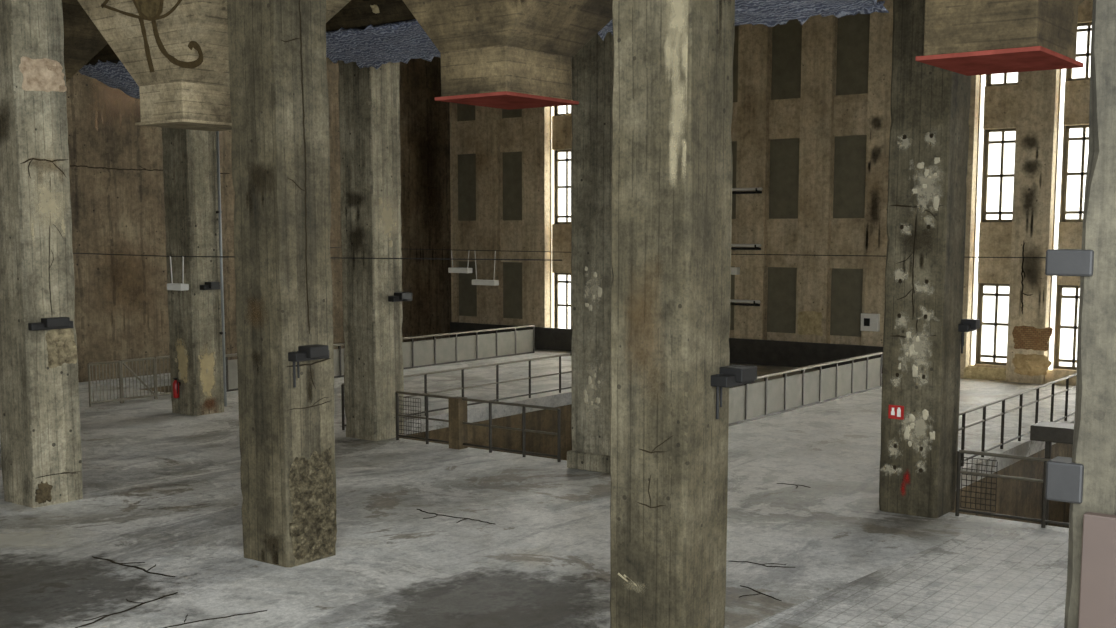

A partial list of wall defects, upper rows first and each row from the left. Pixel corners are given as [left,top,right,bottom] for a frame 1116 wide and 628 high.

peeling [912,133,940,229]
damp [1024,138,1041,233]
peeling [895,270,929,292]
spalling [45,328,77,368]
peeling [141,341,215,396]
peeling [893,307,933,385]
peeling [883,409,935,473]
spalling [289,447,337,561]
crack [75,556,267,628]